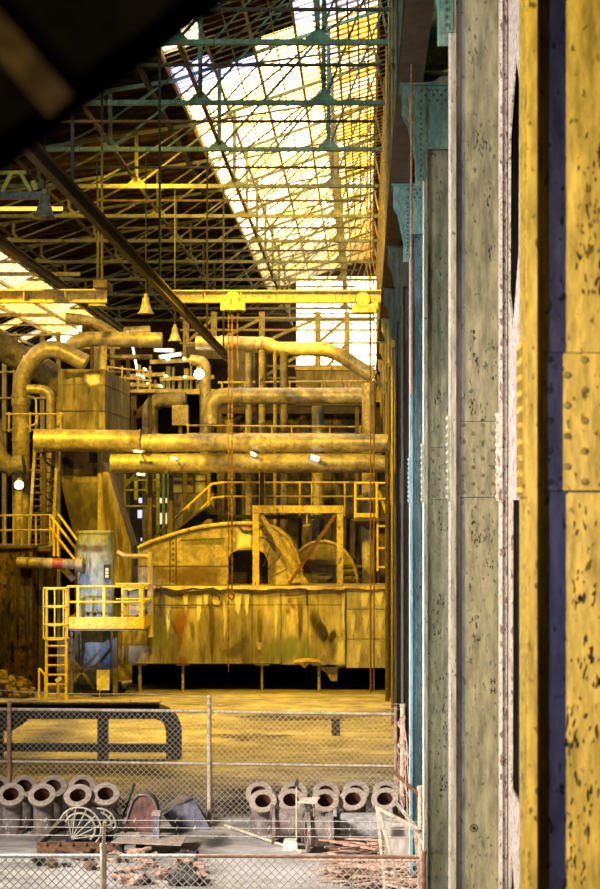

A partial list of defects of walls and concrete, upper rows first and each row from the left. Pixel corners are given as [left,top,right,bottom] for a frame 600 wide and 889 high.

peeling [575,143,600,296]
peeling [572,577,596,611]
leakage [148,611,170,655]
leakage [184,595,249,653]
leakage [258,590,384,663]
peeling [570,632,600,688]
peeling [565,697,598,749]
peeling [564,768,596,836]
peeling [563,844,585,889]